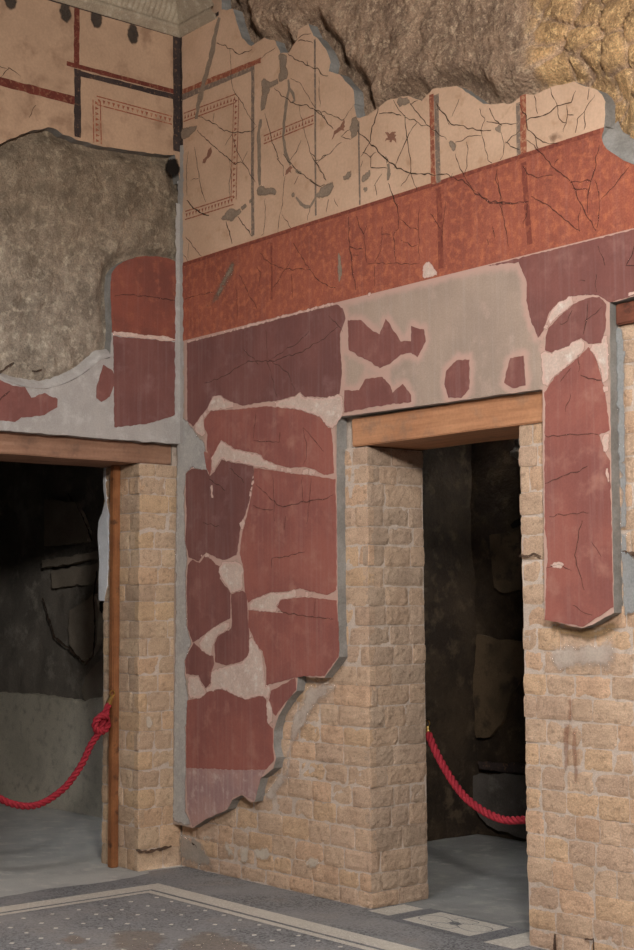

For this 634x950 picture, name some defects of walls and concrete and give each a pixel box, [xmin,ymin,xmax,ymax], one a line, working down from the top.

flaking render [231,0,634,139]
crack [186,17,634,334]
flaking render [0,130,178,389]
peeling [187,303,334,343]
crack [545,356,602,437]
crack [210,430,332,528]
peeling [199,622,229,656]
peeling [188,634,273,724]
peeling [249,589,309,612]
crack [519,512,634,615]